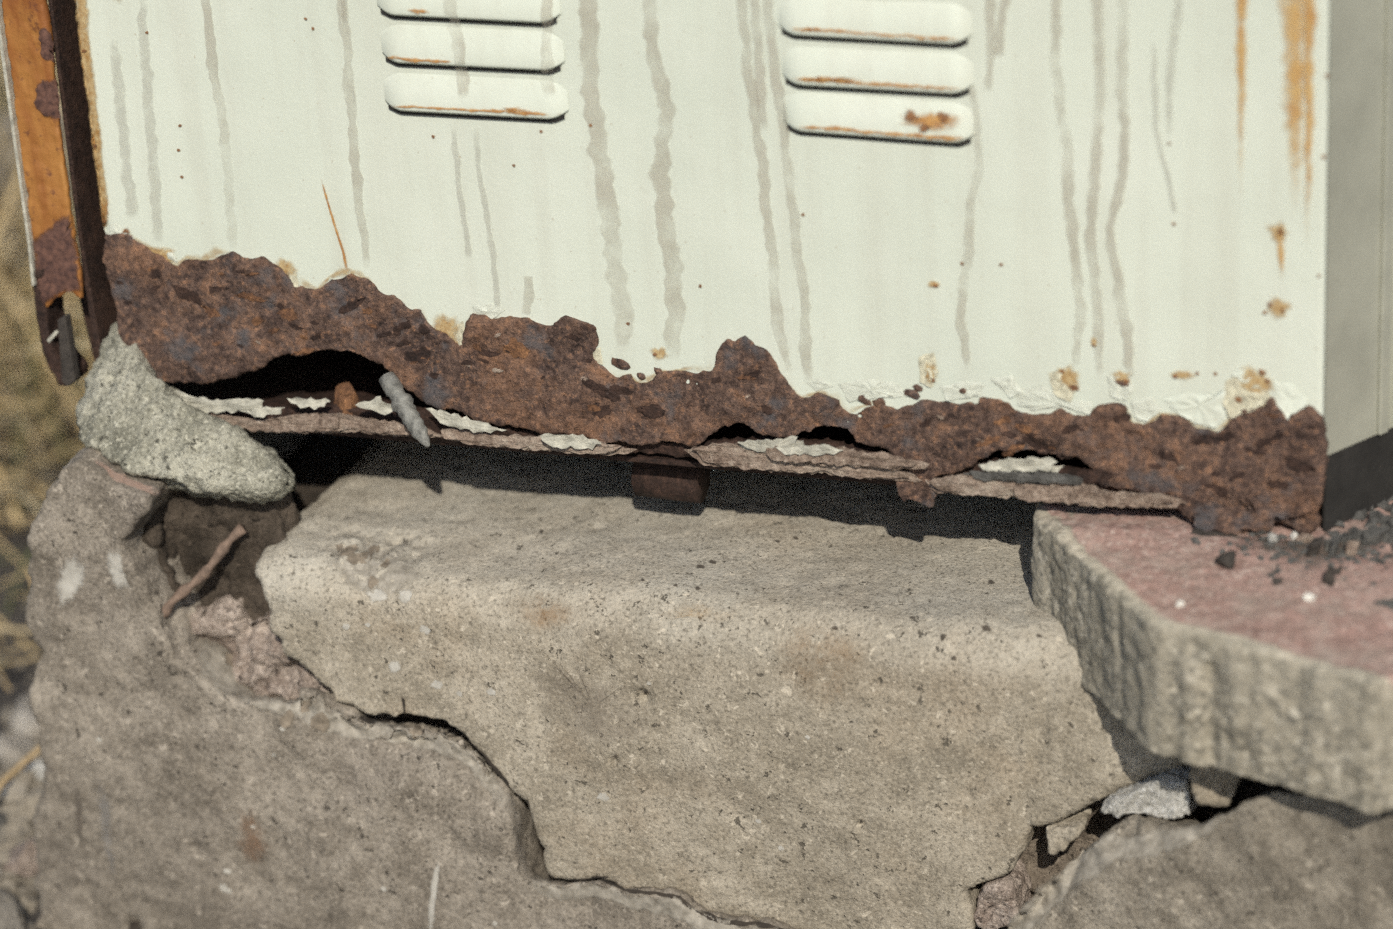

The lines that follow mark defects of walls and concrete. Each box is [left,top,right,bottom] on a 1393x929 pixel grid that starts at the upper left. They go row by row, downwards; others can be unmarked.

damp [203,10,215,49]
rust [34,80,61,118]
damp [1067,115,1129,261]
rust [33,218,80,304]
rust [76,0,1329,534]
peeling [807,376,908,402]
peeling [918,352,1093,415]
peeling [1107,367,1308,427]
crack [161,456,301,627]
crack [359,698,509,786]
crack [1185,777,1305,823]
crack [975,796,1148,929]